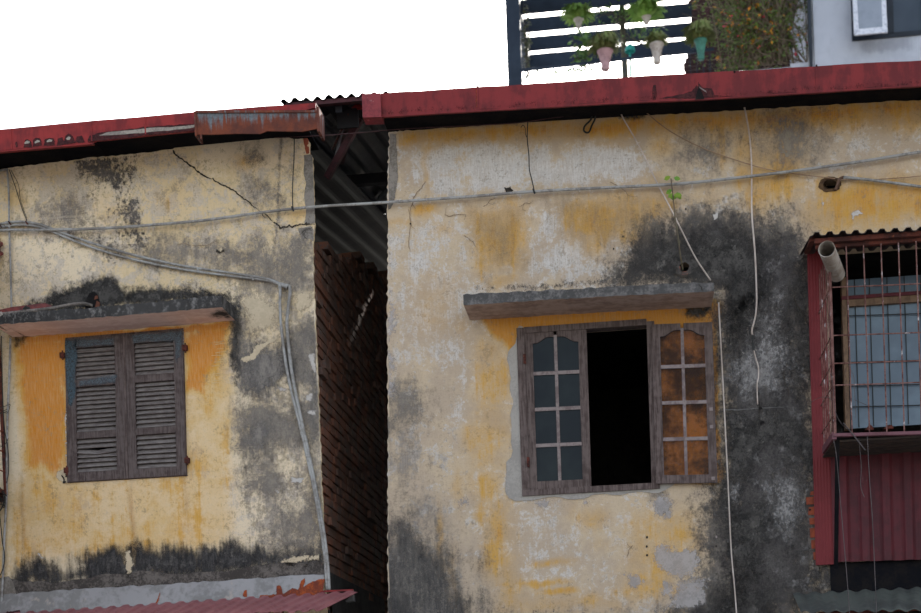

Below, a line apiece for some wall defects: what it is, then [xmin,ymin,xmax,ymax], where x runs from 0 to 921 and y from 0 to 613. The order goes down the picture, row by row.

rust [15,124,195,148]
water stain [38,153,314,289]
crack [173,150,314,239]
peeling [240,293,283,362]
water stain [23,276,319,497]
water stain [388,380,423,432]
water stain [507,203,831,613]
water stain [16,494,323,583]
water stain [388,520,470,613]
peeling [653,544,707,610]